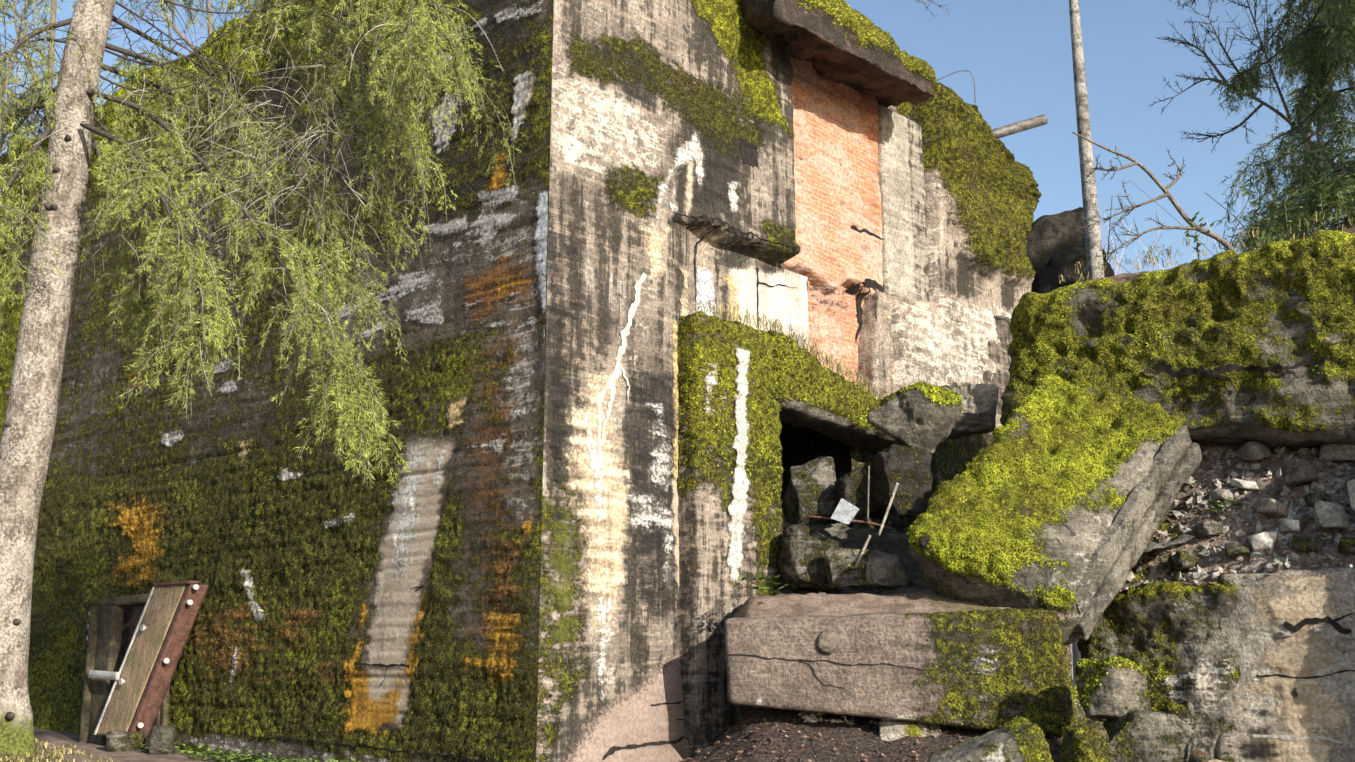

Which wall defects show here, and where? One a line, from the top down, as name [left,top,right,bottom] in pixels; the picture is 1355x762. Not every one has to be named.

spalling [856,90,882,231]
leakage [504,122,741,695]
leakage [727,348,750,580]
crack [1282,613,1353,634]
crack [729,654,938,693]
crack [1256,670,1355,679]
crack [602,701,684,760]